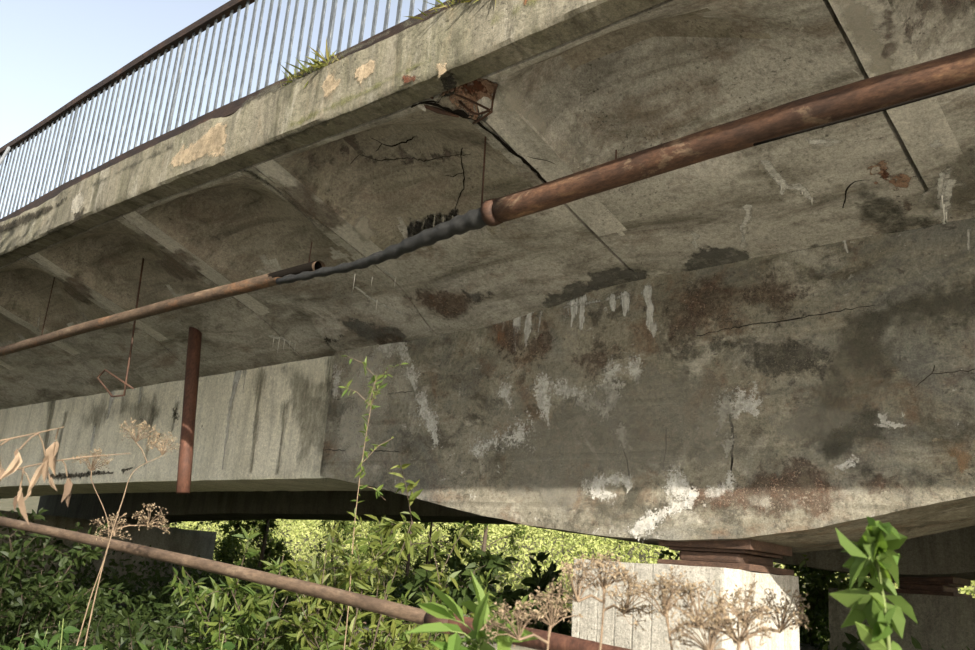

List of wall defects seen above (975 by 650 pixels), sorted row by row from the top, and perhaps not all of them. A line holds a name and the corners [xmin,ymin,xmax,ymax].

spalling [416,63,498,125]
crack [350,136,470,209]
crack [411,100,556,183]
damp [861,150,975,233]
damp [502,311,542,351]
damp [565,286,657,337]
crack [697,305,874,336]
damp [847,283,975,378]
damp [801,364,883,459]